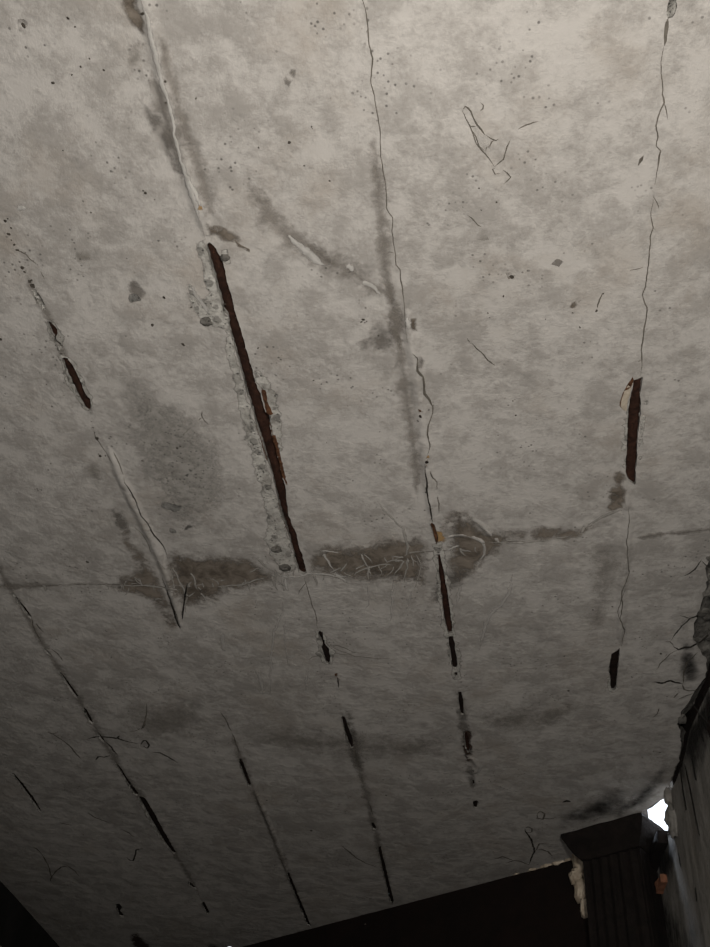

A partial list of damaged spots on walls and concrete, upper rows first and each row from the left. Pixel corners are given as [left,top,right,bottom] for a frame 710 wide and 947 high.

leakage [287,233,354,271]
leakage [362,279,416,362]
crack [362,0,440,522]
crack [463,102,538,183]
crack [630,19,669,369]
spalling [188,241,307,574]
crack [94,433,219,628]
leakage [69,506,431,626]
leakage [444,472,625,584]
crack [654,611,709,717]
spalling [669,556,710,788]
crack [48,706,178,763]